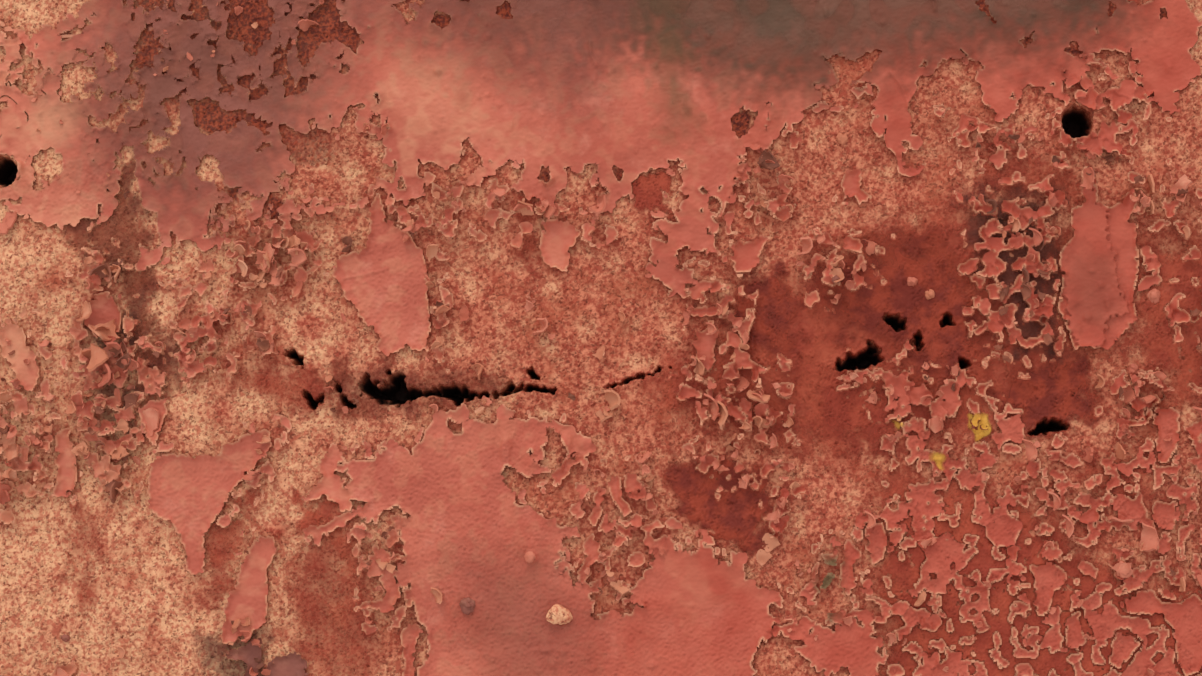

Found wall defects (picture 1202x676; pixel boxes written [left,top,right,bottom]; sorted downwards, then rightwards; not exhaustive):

spalling [180,0,275,60]
spalling [217,54,272,101]
rust [68,161,180,403]
rust [654,196,1104,458]
peeling [1040,297,1074,363]
rust [1137,235,1202,406]
peeling [1163,293,1202,360]
crack [337,365,557,409]
crack [608,367,671,389]
rust [663,457,774,553]
rust [876,476,1202,676]
peeling [901,638,989,676]